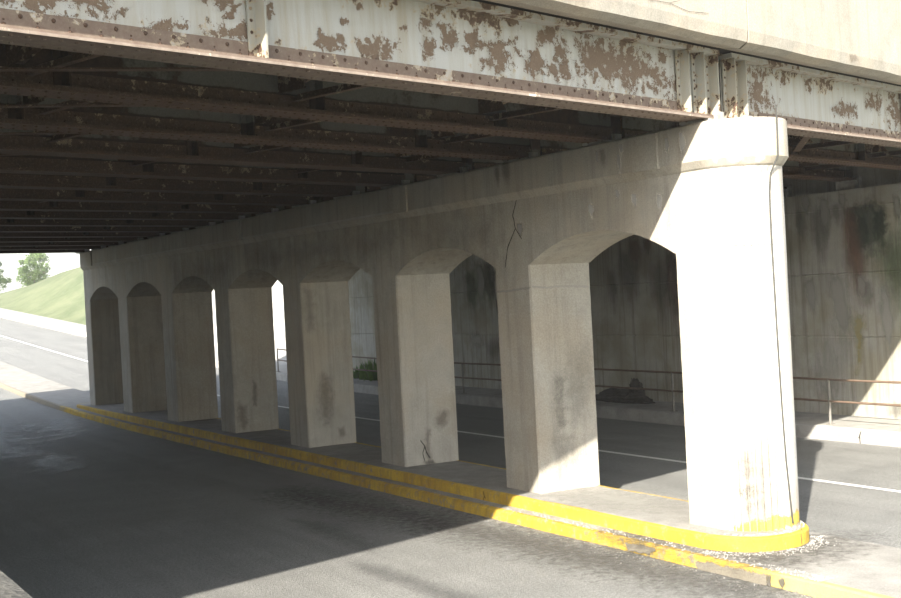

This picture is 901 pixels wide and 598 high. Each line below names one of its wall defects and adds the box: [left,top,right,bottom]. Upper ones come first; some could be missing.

peeling [0,0,128,22]
peeling [142,16,188,32]
peeling [199,0,248,42]
peeling [313,4,677,101]
peeling [747,65,786,116]
peeling [831,90,901,132]
crack [505,200,522,267]